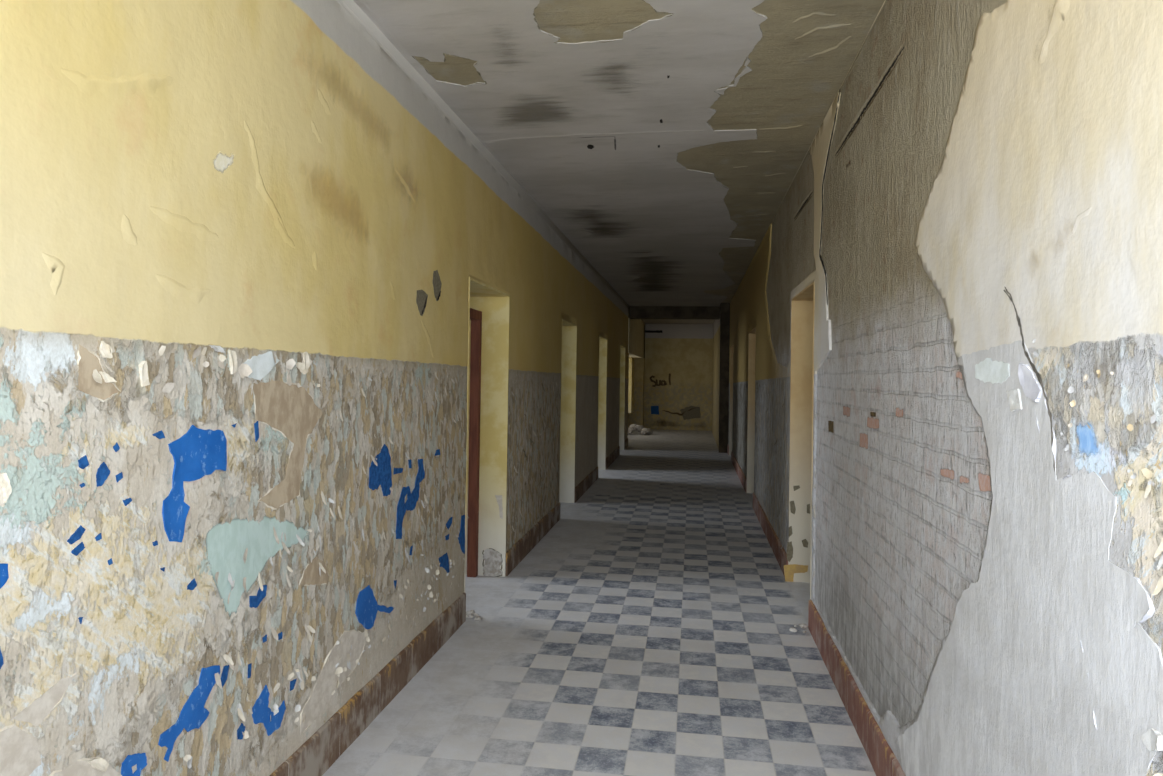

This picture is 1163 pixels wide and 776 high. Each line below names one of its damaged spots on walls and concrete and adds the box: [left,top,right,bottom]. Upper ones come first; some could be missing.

spalling [412,53,487,86]
spalling [533,0,673,43]
peeling [192,346,323,510]
spalling [677,0,1007,727]
crack [1003,287,1056,473]
peeling [1036,364,1163,506]
peeling [215,652,244,688]
peeling [235,693,253,739]
peeling [215,486,343,606]
peeling [270,536,465,735]
peeling [1134,532,1163,623]
peeling [1140,728,1163,776]